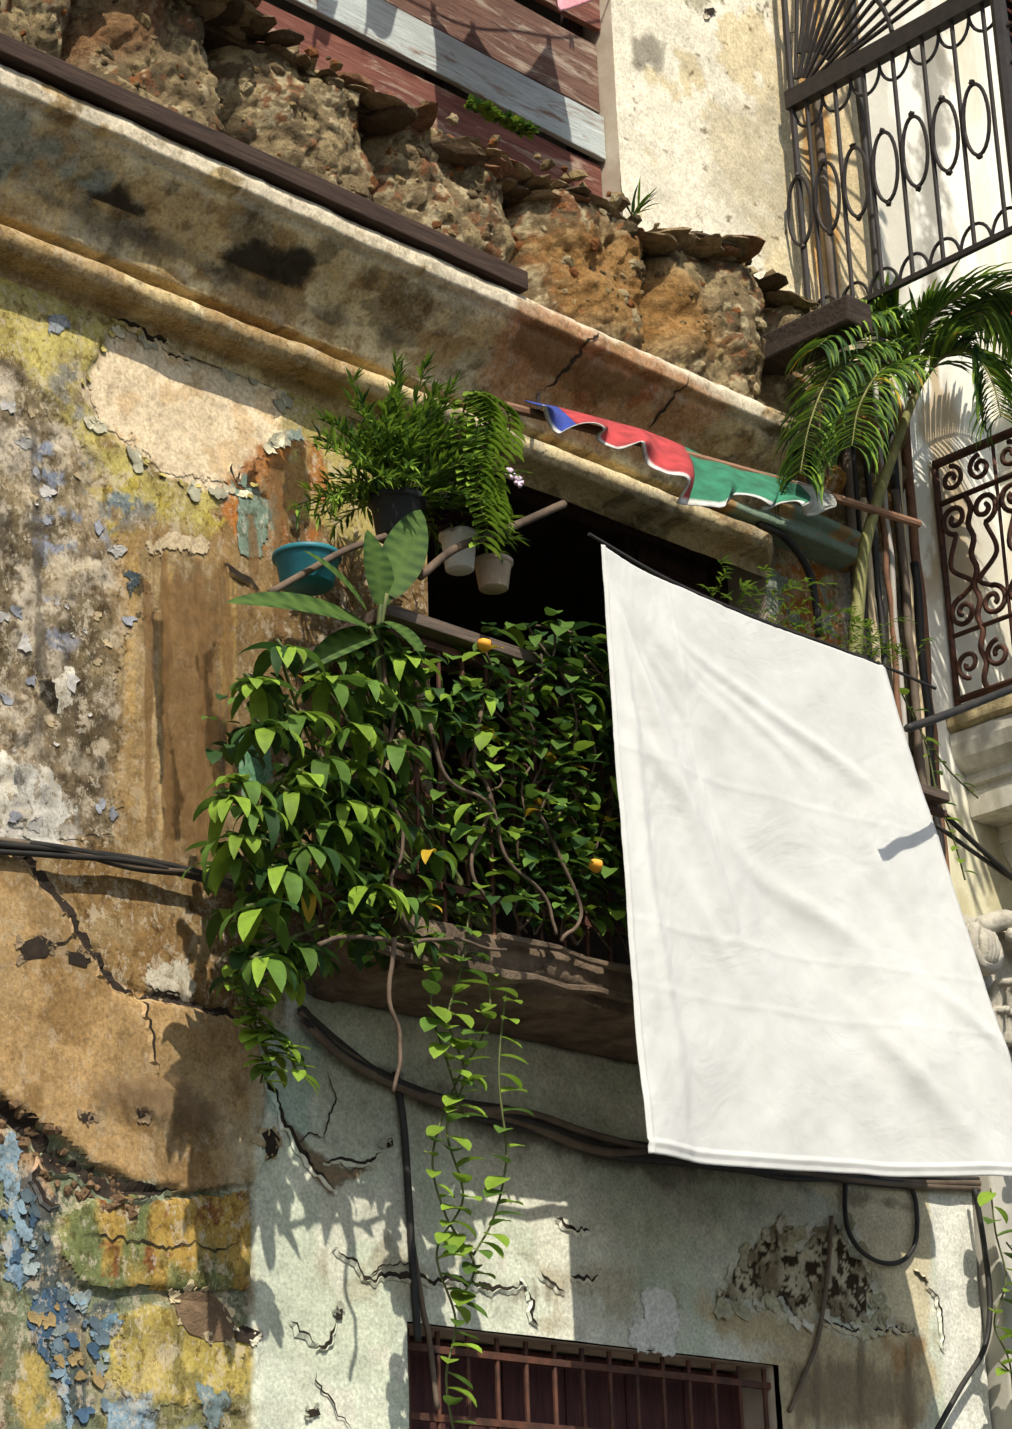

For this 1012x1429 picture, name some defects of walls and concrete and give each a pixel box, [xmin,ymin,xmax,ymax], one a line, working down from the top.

spalling [0,0,835,478]
crack [544,333,599,391]
flaking render [0,325,305,845]
crack [4,855,383,1196]
peeling [0,1128,147,1429]
crack [0,1101,247,1252]
peeling [169,1279,264,1349]
crack [330,1247,599,1327]
crack [554,1217,591,1237]
flaking render [713,1211,916,1342]
peeling [196,1382,231,1429]